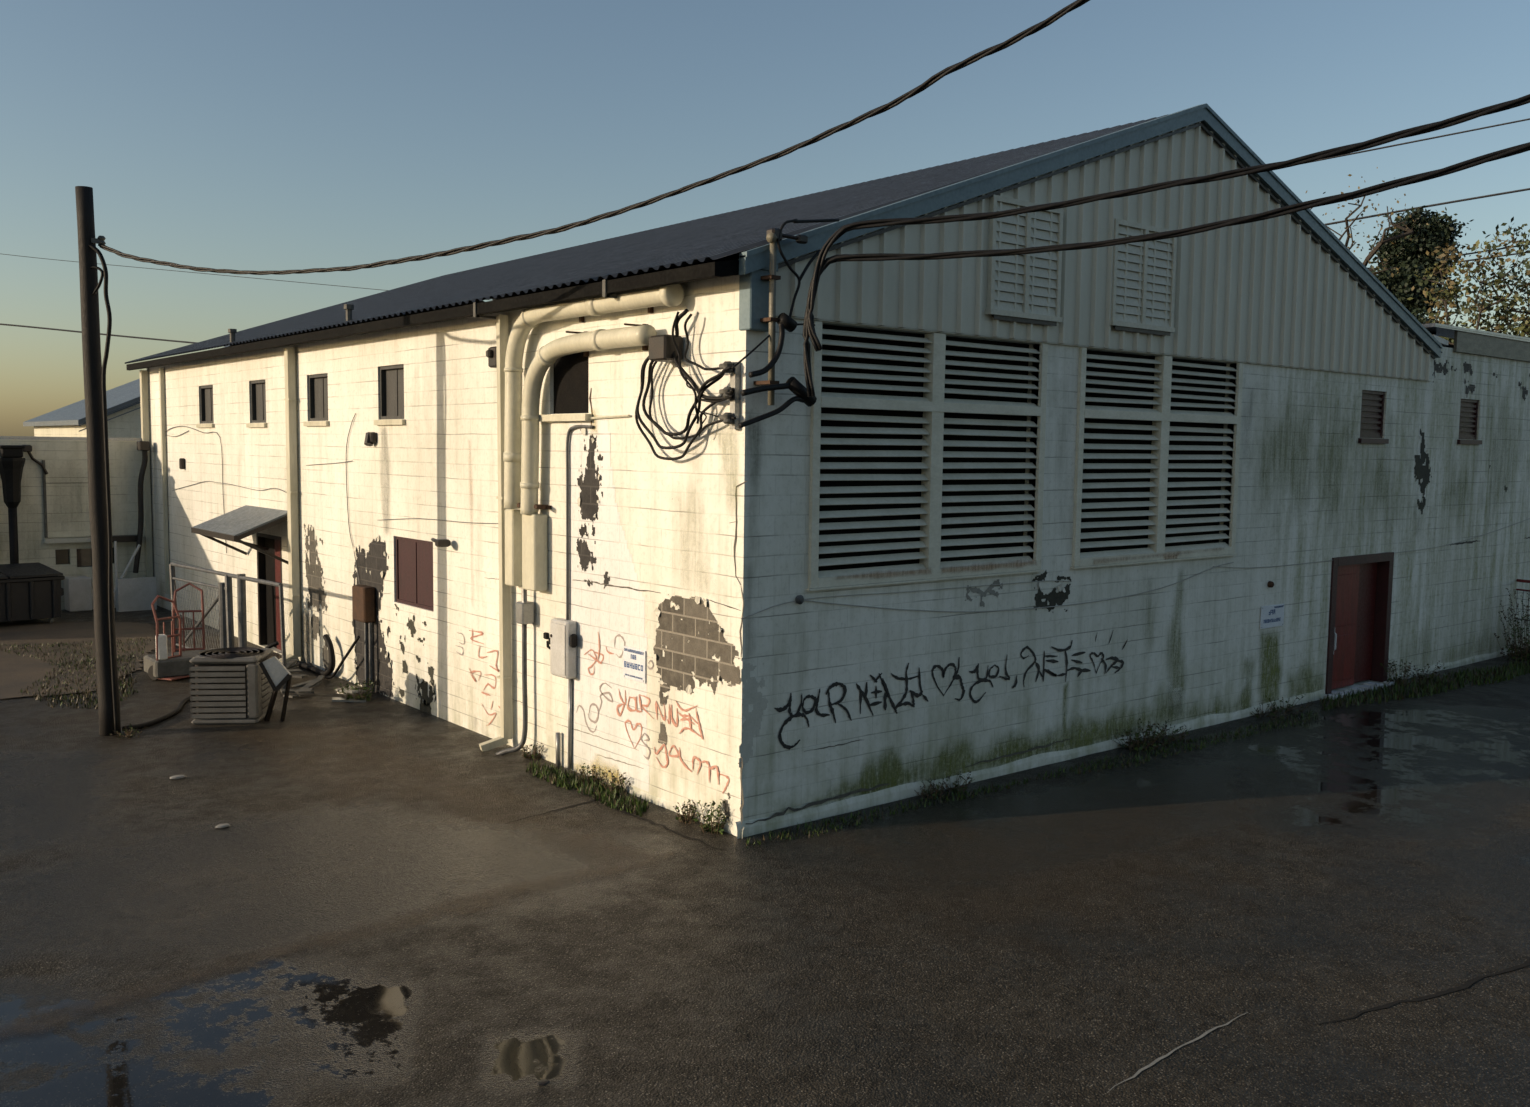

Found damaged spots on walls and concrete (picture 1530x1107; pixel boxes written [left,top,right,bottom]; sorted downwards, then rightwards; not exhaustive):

peeling [575,428,610,588]
peeling [1414,429,1432,514]
peeling [303,524,329,670]
peeling [352,536,436,715]
peeling [653,594,768,769]
peeling [1032,571,1071,612]